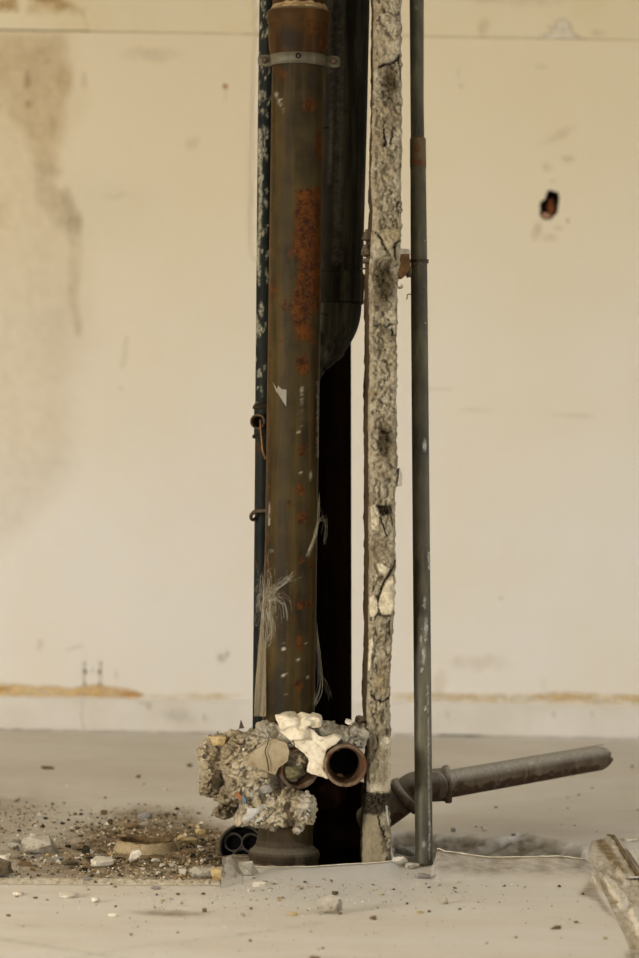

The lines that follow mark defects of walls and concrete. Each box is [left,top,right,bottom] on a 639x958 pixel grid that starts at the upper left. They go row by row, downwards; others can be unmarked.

spalling [539,190,560,220]